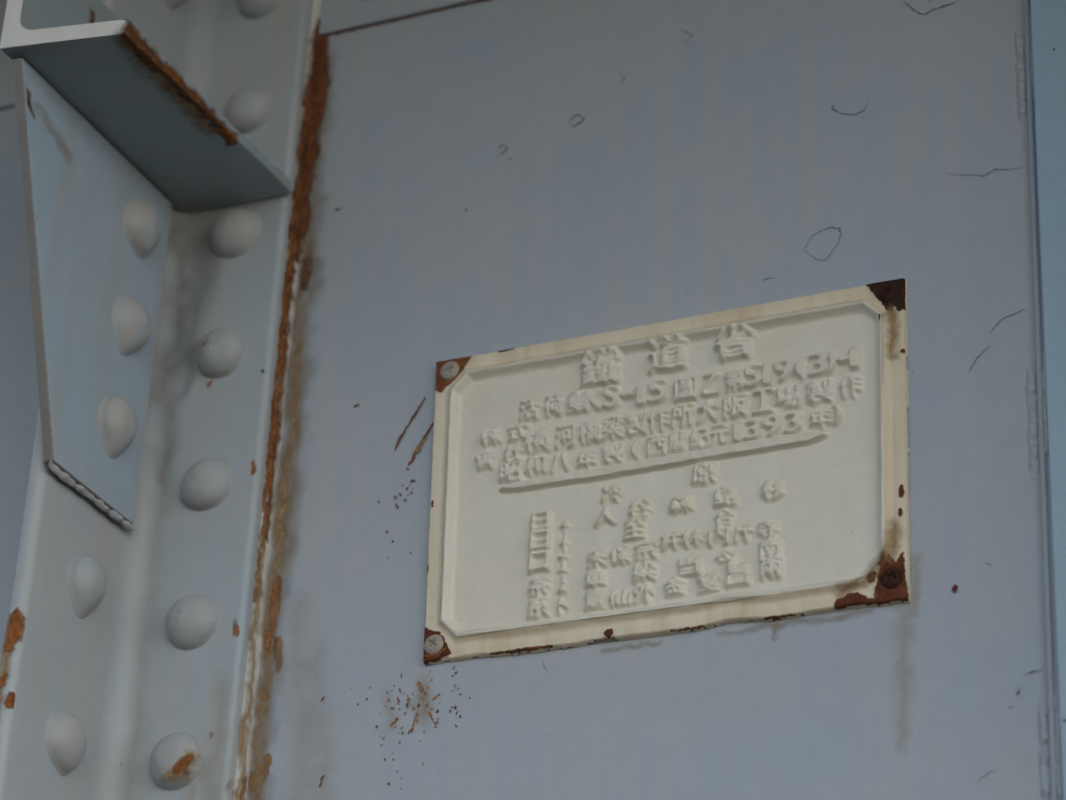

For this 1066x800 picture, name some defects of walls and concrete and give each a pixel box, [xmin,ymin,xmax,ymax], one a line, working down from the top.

corrosion [118,20,237,146]
corrosion [866,278,906,358]
corrosion [233,0,489,800]
corrosion [834,523,909,610]
corrosion [0,608,26,708]
corrosion [490,645,553,655]
corrosion [761,613,804,621]
corrosion [162,752,195,779]